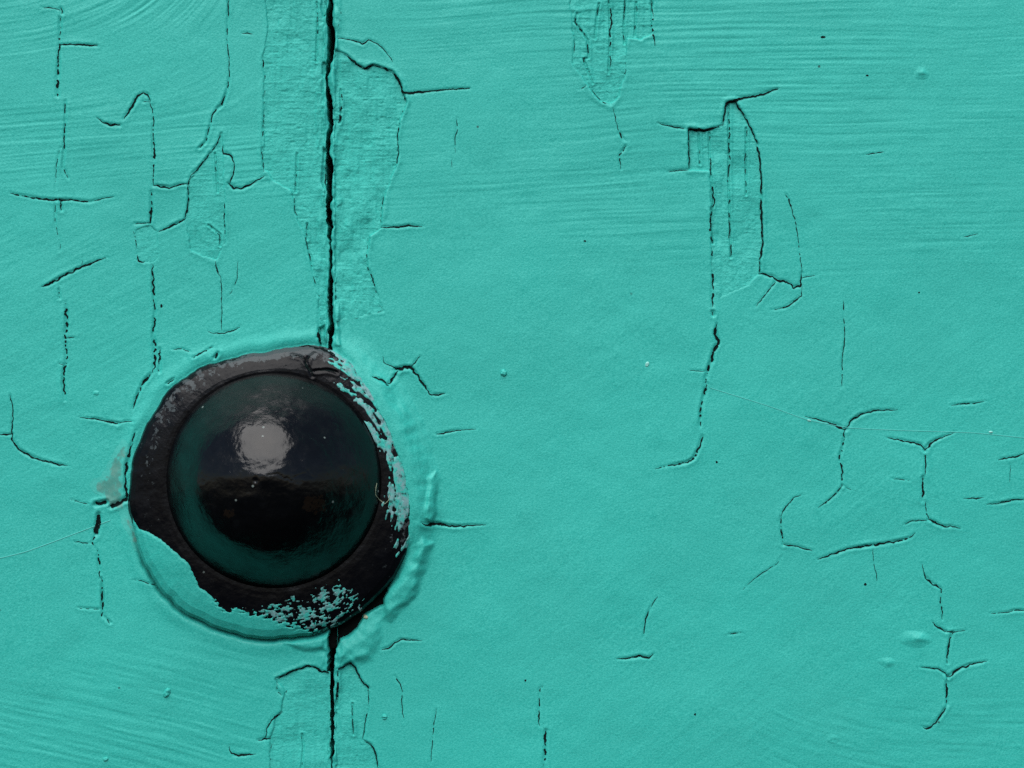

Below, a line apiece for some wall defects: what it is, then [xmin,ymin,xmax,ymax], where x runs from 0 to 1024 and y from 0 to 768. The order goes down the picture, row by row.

crack [11,7,110,247]
crack [0,397,67,466]
crack [42,259,102,394]
crack [74,1,265,622]
crack [366,196,421,308]
crack [372,356,445,396]
crack [422,520,483,528]
crack [656,251,720,469]
crack [753,409,961,580]
spalling [329,583,390,649]
crack [617,598,657,659]
crack [922,566,984,729]